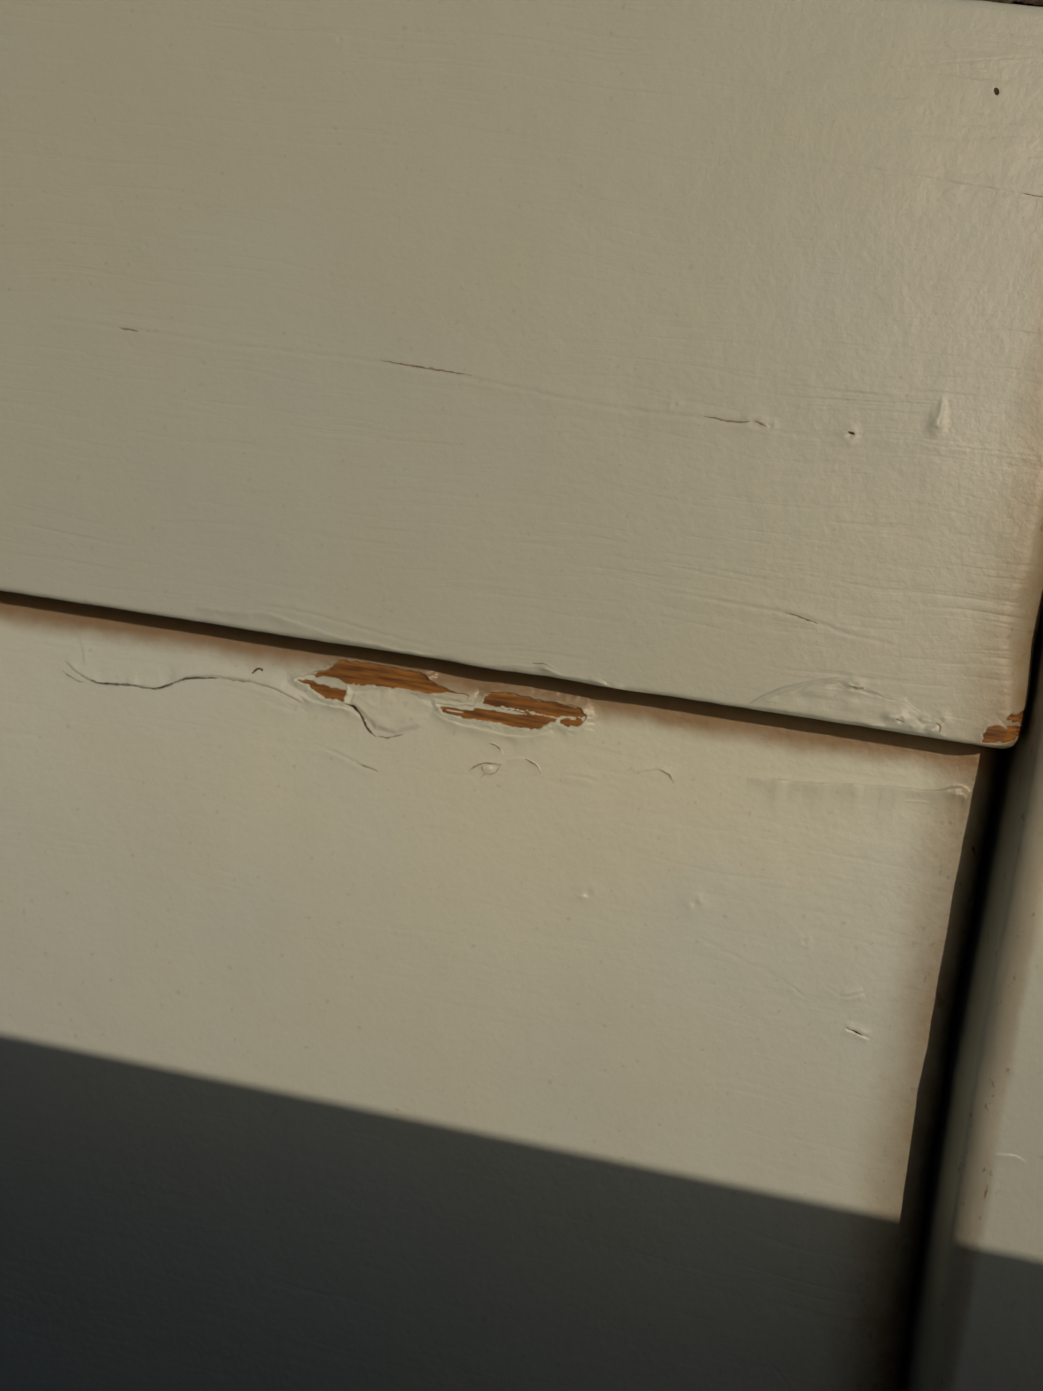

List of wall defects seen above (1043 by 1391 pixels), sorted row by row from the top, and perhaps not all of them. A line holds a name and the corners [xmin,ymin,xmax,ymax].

crack [61,634,314,715]
peeling [194,593,653,757]
peeling [745,667,1029,749]